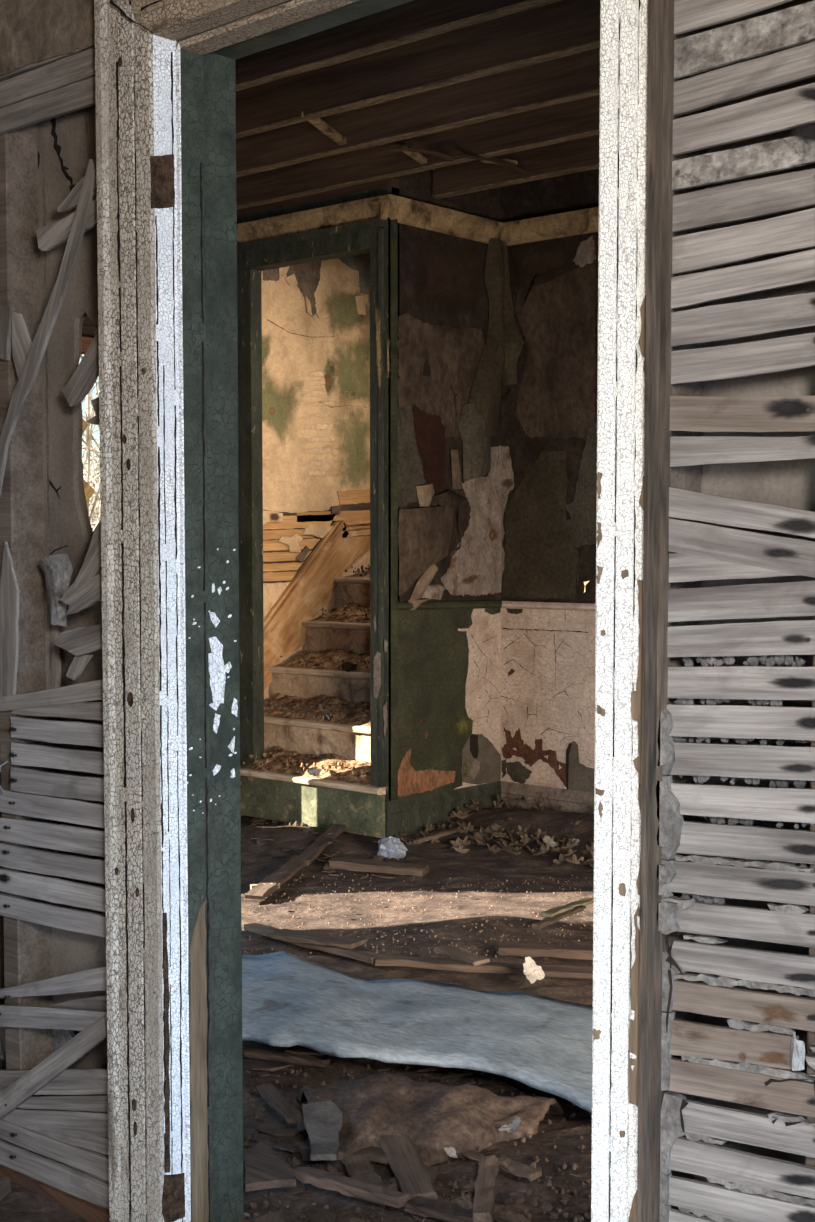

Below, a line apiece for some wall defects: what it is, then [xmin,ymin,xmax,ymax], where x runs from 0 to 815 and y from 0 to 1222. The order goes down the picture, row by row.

spalling [262,253,389,583]
spalling [412,407,447,493]
spalling [441,446,523,615]
peeling [188,610,238,778]
peeling [373,617,388,737]
peeling [398,749,480,797]
peeling [501,728,567,788]